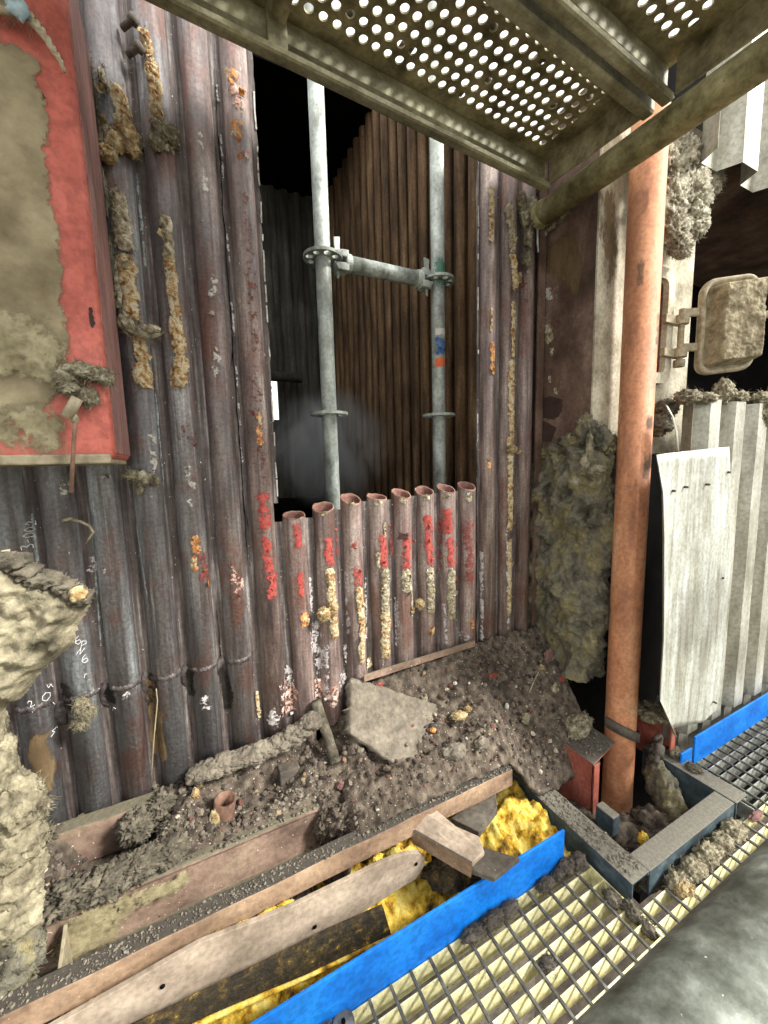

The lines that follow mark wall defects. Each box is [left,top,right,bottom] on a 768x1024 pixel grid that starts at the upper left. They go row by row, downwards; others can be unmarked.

rust [224,68,250,159]
rust [190,535,210,587]